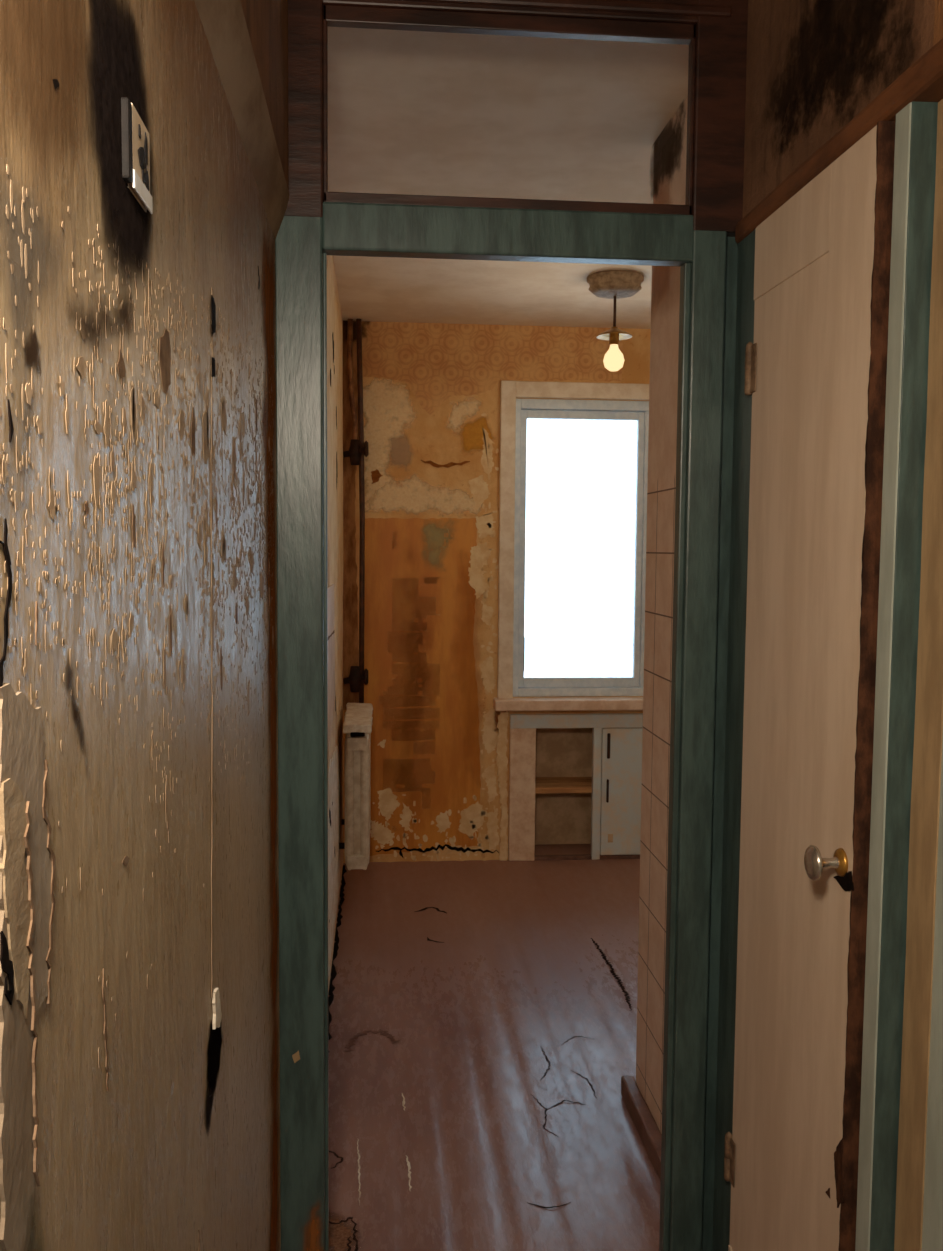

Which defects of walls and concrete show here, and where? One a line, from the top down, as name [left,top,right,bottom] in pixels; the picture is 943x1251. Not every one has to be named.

damp [781,0,885,147]
peeling [6,165,40,307]
flaking render [363,379,508,861]
peeling [0,224,274,1251]
crack [376,844,499,858]